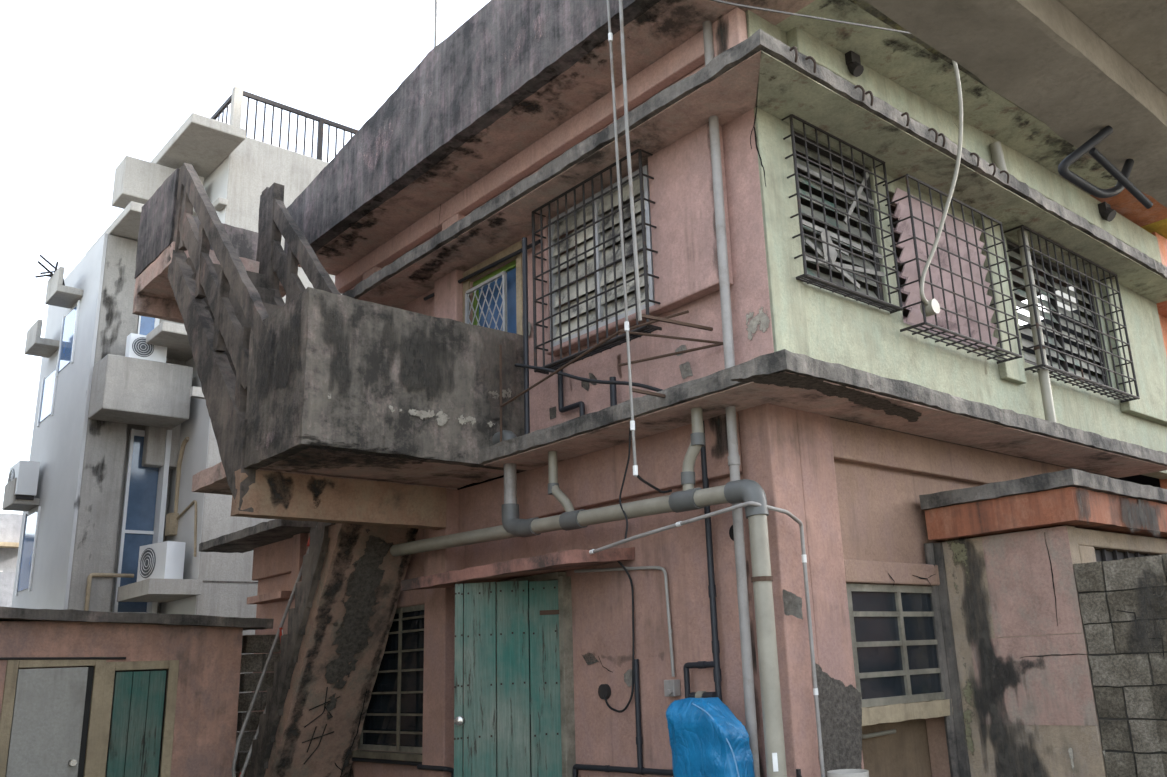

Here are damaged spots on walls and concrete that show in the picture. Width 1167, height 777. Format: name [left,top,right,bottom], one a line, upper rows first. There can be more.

water stain [512,40,606,114]
water stain [716,16,728,55]
water stain [321,296,349,394]
water stain [383,312,454,395]
peeling [389,404,499,427]
spalling [730,372,922,422]
crack [1044,532,1058,626]
water stain [276,524,362,777]
water stain [341,528,418,777]
water stain [948,537,1048,777]
crack [1021,652,1087,660]
spalling [815,663,862,777]